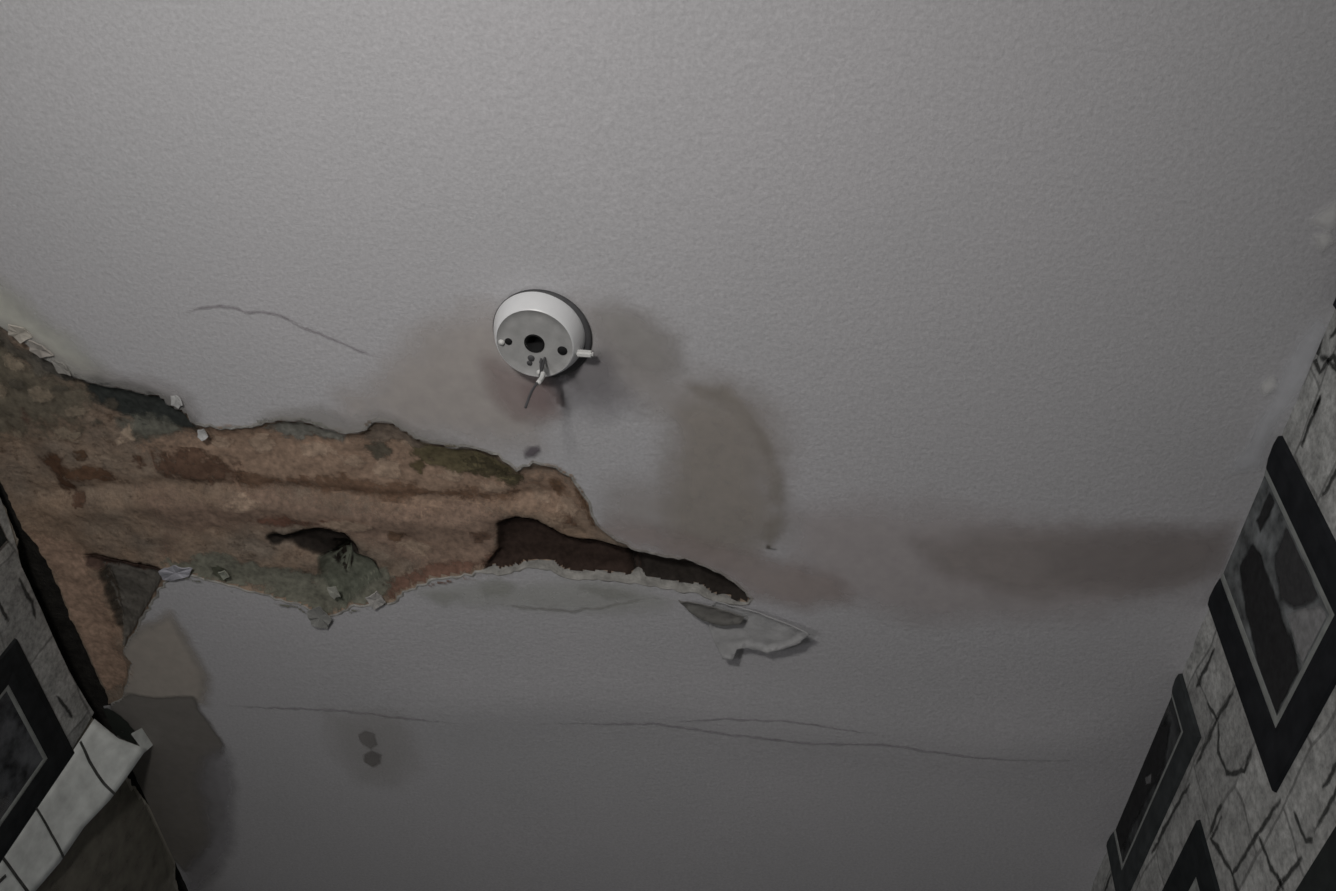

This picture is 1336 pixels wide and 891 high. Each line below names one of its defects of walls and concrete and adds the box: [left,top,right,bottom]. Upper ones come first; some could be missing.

spalling [0,324,810,705]
water stain [379,327,528,430]